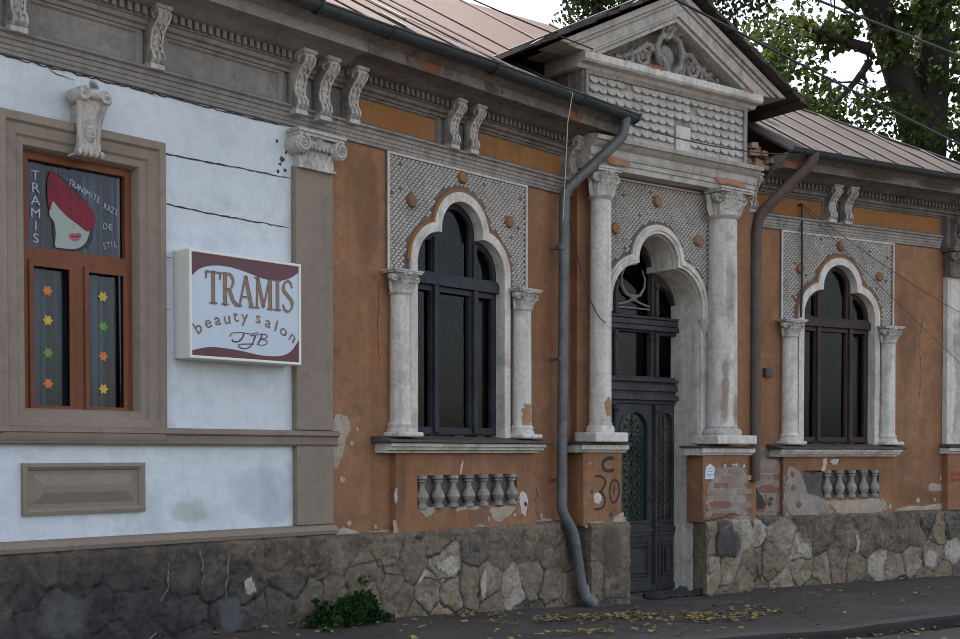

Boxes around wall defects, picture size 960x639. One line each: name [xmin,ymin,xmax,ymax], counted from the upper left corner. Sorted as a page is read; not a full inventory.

peeling [521,404,532,426]
peeling [604,396,612,416]
peeling [330,413,358,483]
flaking render [705,446,942,522]
spalling [455,491,528,527]
crack [343,554,462,585]